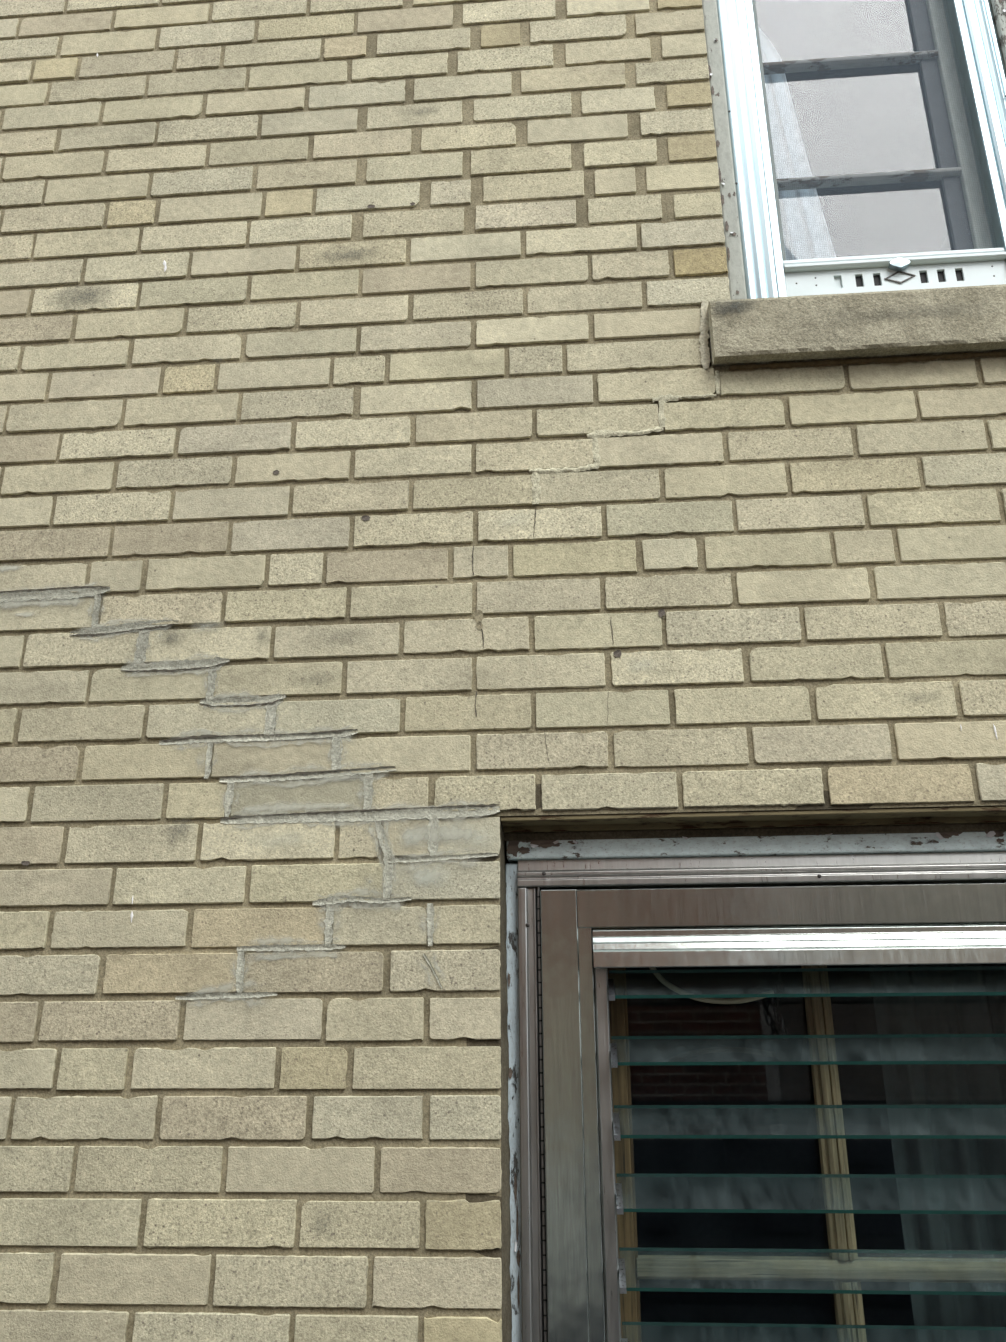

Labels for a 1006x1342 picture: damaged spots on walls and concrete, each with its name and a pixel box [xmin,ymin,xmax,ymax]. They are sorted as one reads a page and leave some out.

crack [0,566,500,1006]